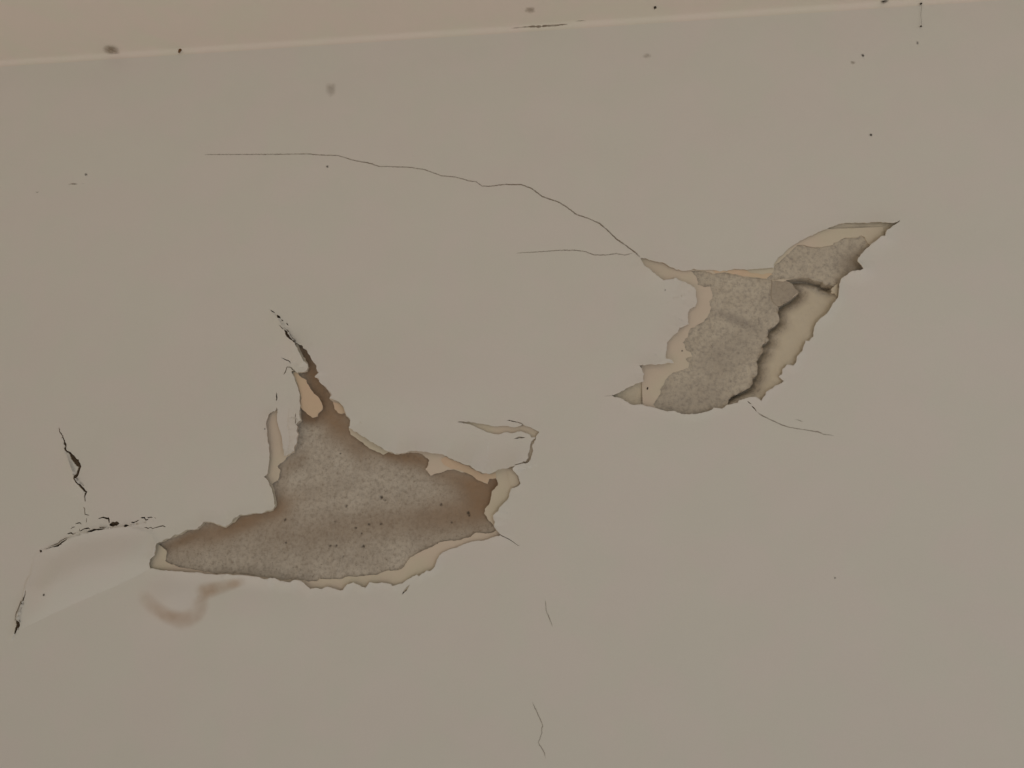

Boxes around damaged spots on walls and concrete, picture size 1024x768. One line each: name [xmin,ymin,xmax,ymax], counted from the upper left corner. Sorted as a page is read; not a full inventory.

crack [408,167,637,255]
peeling [606,215,906,419]
crack [40,432,165,552]
peeling [146,340,539,596]
crack [15,597,25,633]